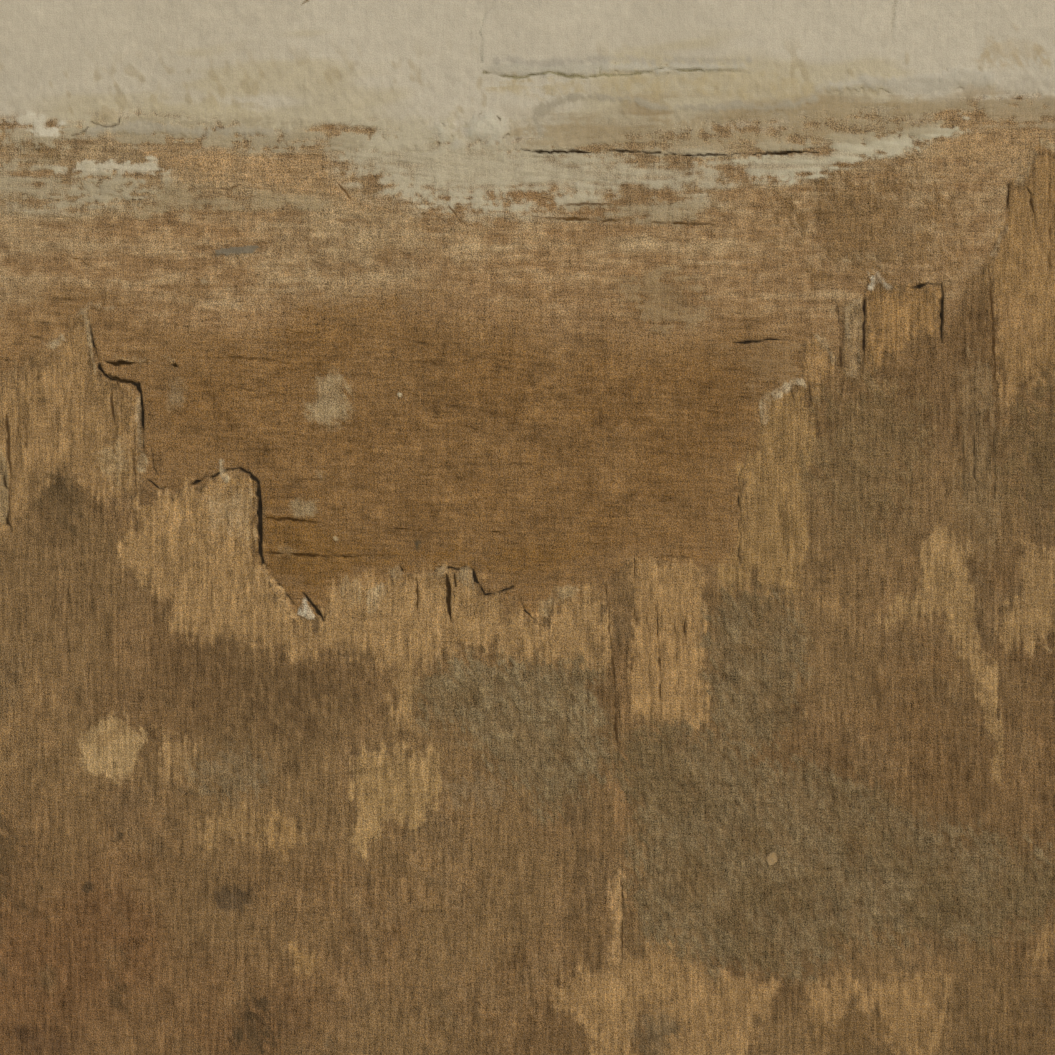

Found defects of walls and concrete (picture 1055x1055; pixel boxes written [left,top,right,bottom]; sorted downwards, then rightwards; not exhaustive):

crack [478,0,750,81]
peeling [0,90,1055,623]